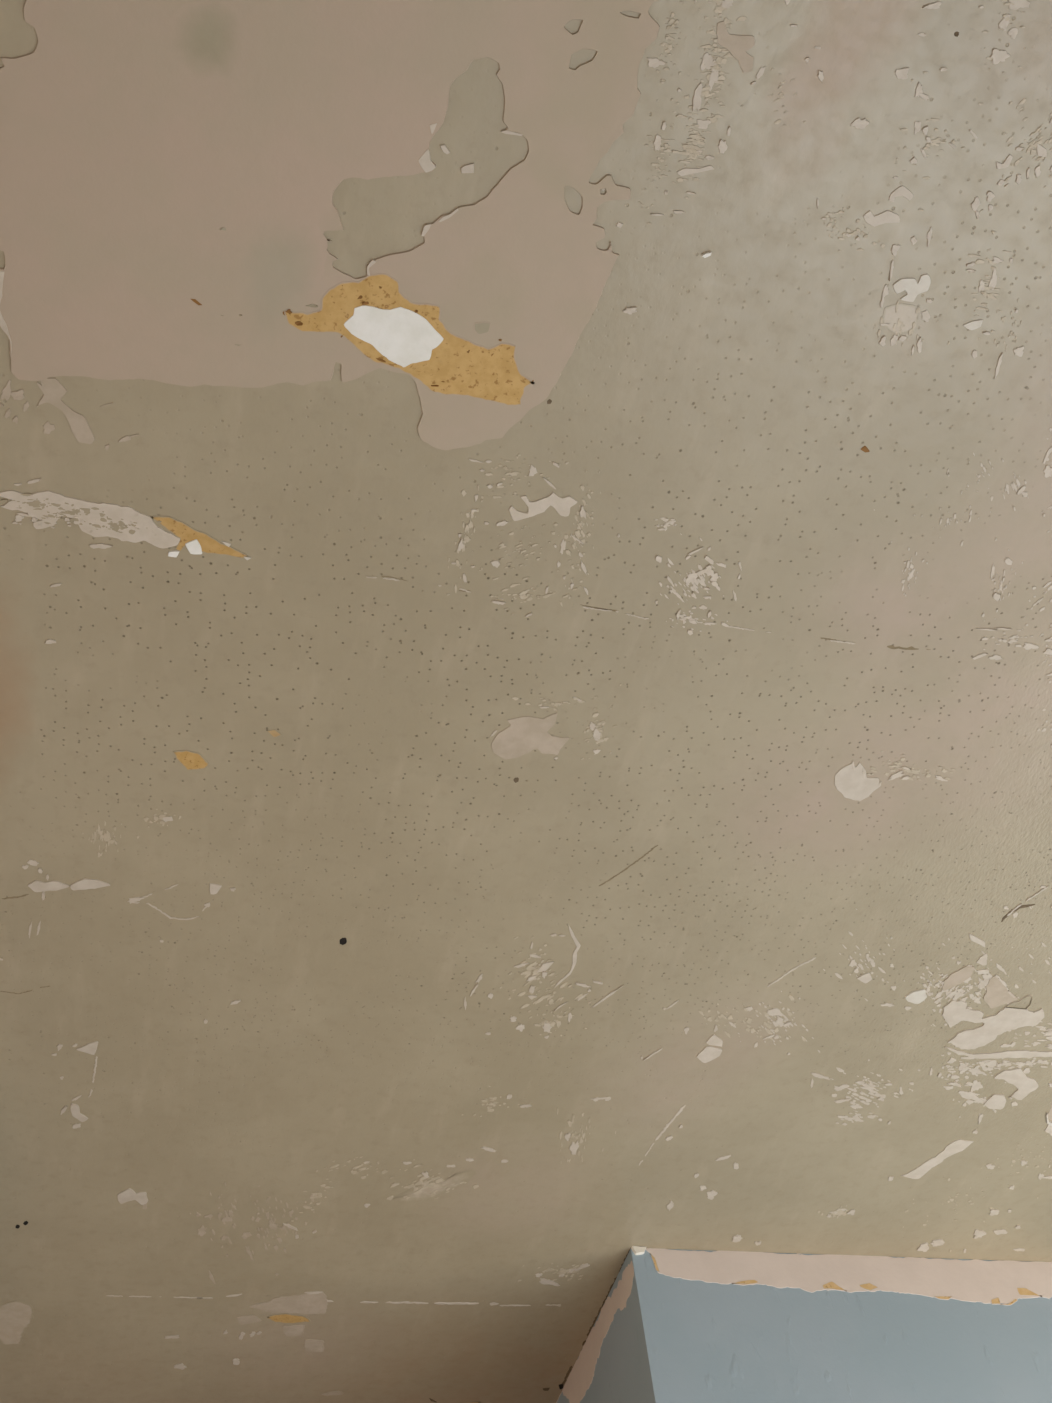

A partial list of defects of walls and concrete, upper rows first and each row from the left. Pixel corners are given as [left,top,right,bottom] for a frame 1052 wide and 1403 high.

peeling [979,0,1030,73]
peeling [971,98,1052,219]
peeling [794,118,977,355]
peeling [0,0,797,617]
peeling [963,231,1030,378]
peeling [644,537,742,635]
peeling [972,538,1052,683]
peeling [22,860,110,901]
crack [1001,885,1052,922]
peeling [464,924,623,1039]
peeling [557,931,1052,1403]
peeling [0,1301,34,1345]